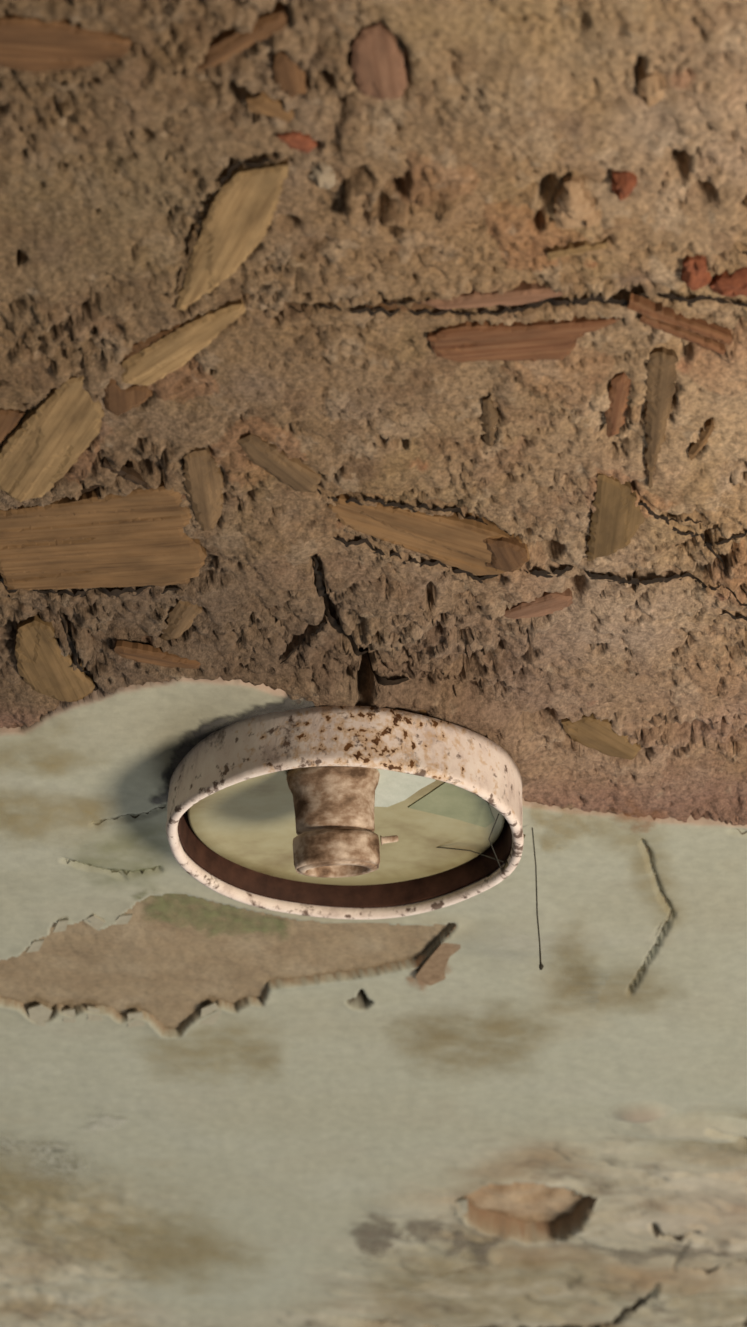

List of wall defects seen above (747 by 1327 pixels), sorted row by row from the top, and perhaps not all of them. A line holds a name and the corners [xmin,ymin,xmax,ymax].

spalling [0,0,747,826]
crack [280,489,747,686]
peeling [0,894,461,1029]
crack [632,839,673,987]
water stain [353,1217,496,1263]
spalling [455,1182,612,1223]
crack [490,1223,742,1327]